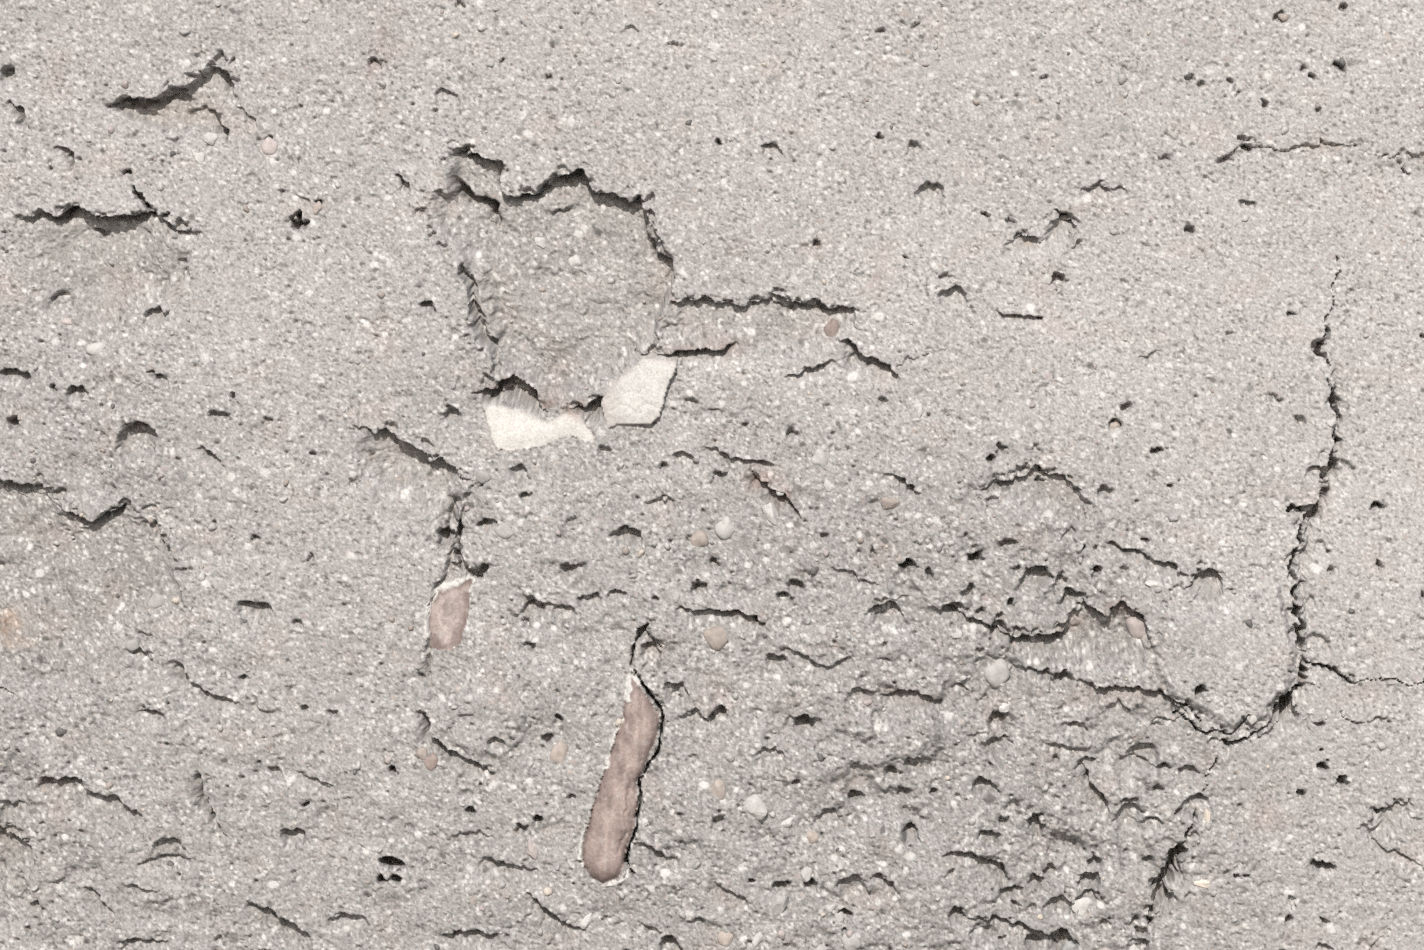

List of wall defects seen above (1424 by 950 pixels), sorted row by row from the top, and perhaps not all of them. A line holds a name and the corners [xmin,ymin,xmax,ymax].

spalling [396,141,899,428]
crack [1226,135,1424,186]
crack [1143,237,1424,950]
crack [625,622,666,877]